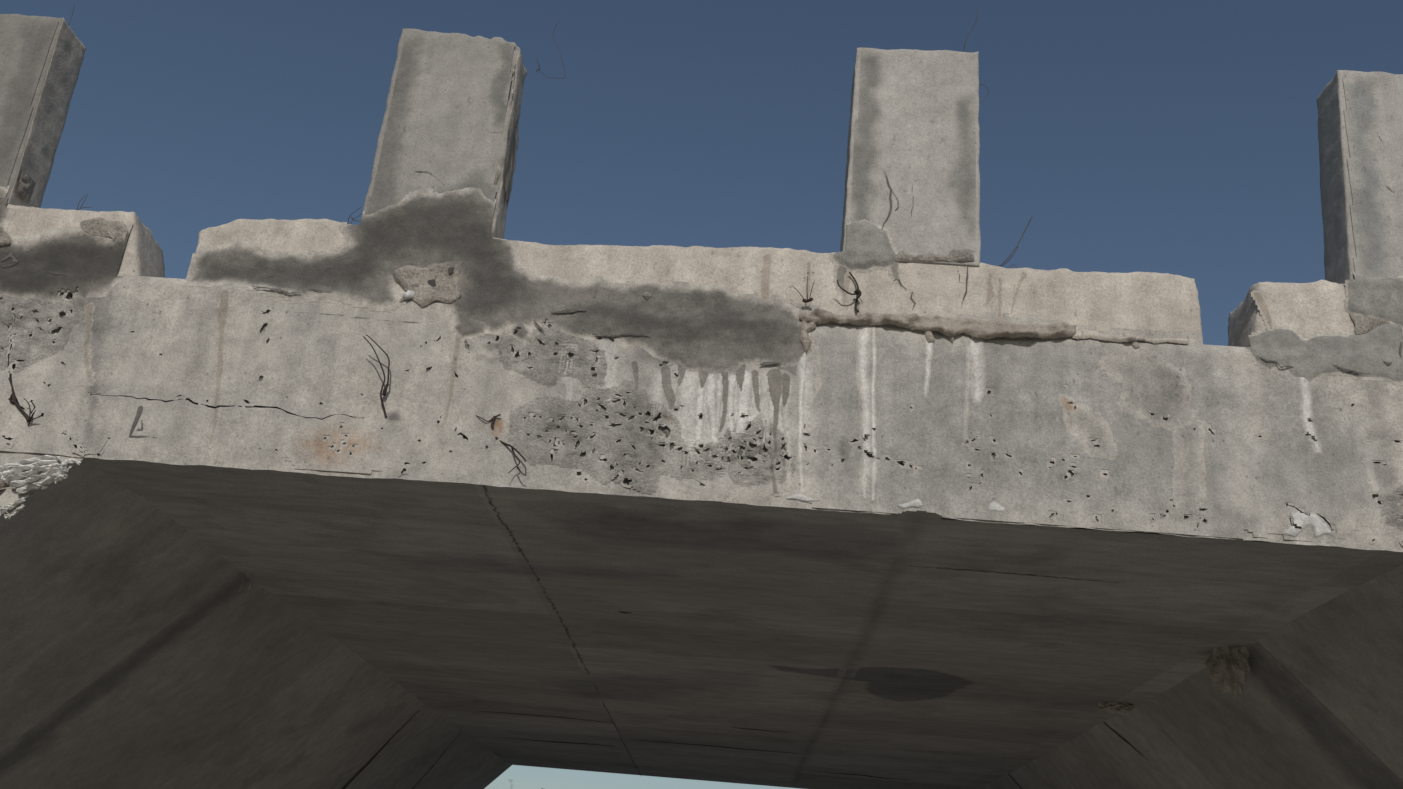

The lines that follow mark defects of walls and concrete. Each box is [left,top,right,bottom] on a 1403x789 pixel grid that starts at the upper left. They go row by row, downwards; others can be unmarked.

spalling [17,171,36,204]
peeling [0,227,10,247]
spalling [80,217,128,242]
spalling [393,261,462,307]
leakage [758,251,775,300]
crack [4,311,363,455]
leakage [334,260,1403,586]
peeling [1284,511,1332,542]
leakage [517,662,984,705]